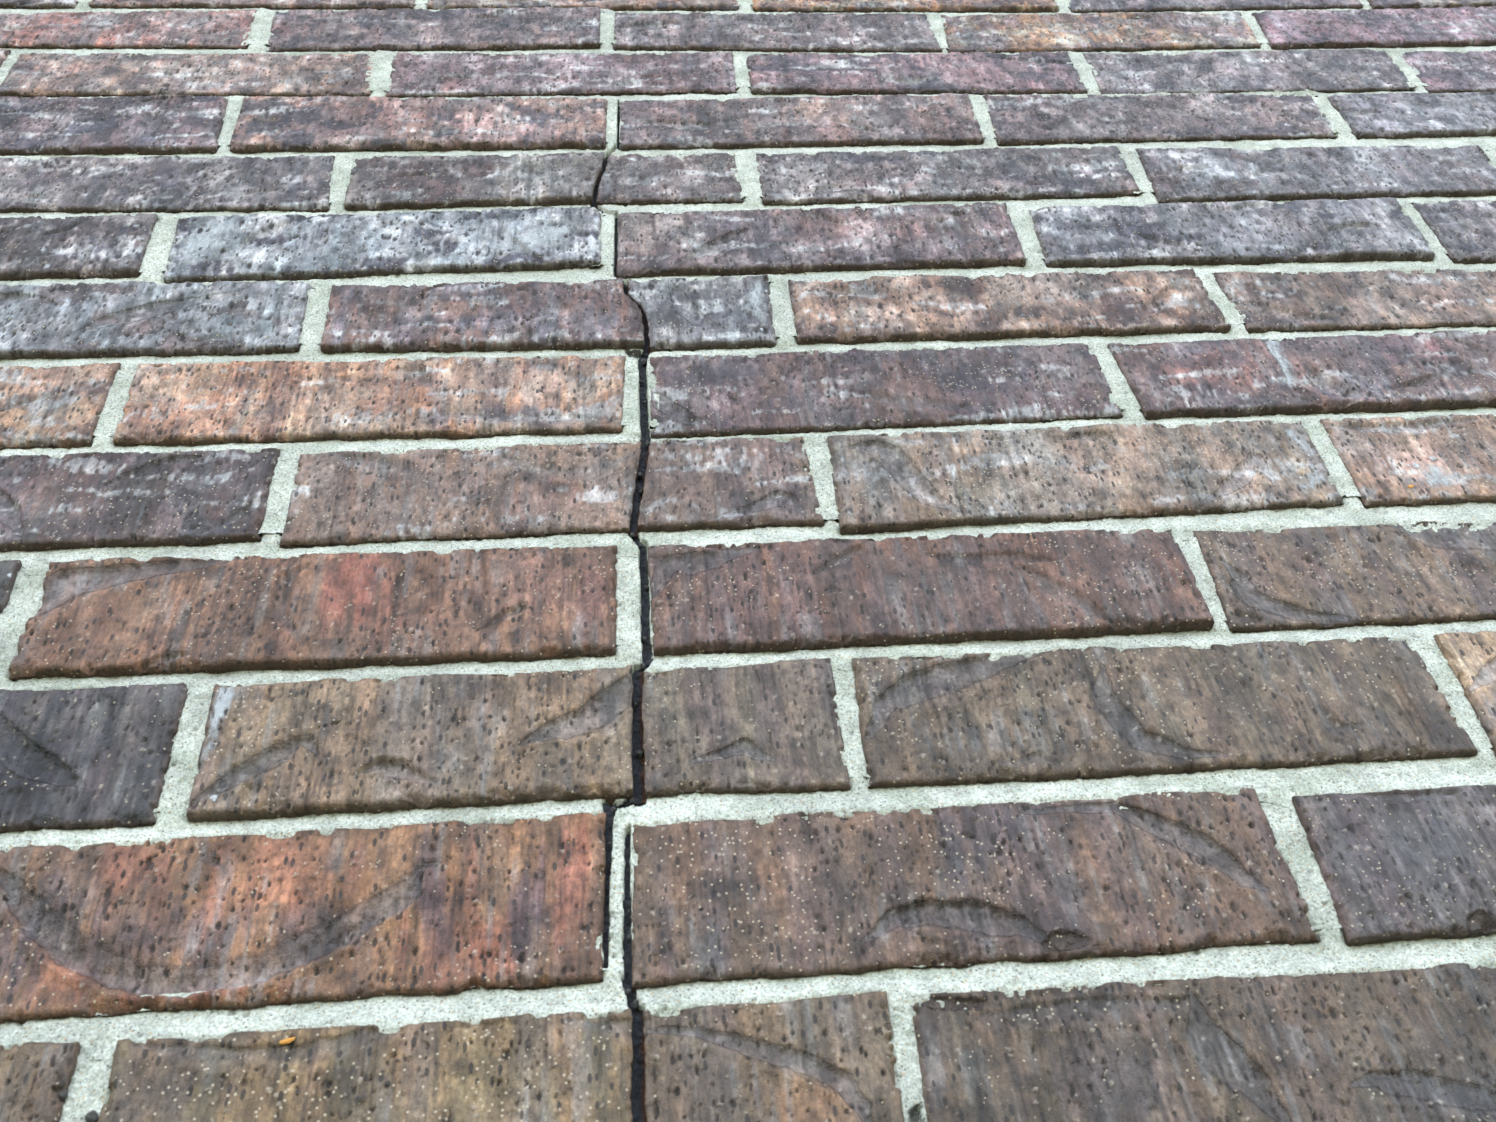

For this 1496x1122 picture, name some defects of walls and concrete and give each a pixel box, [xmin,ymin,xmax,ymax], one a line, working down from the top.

crack [590,106,653,1122]